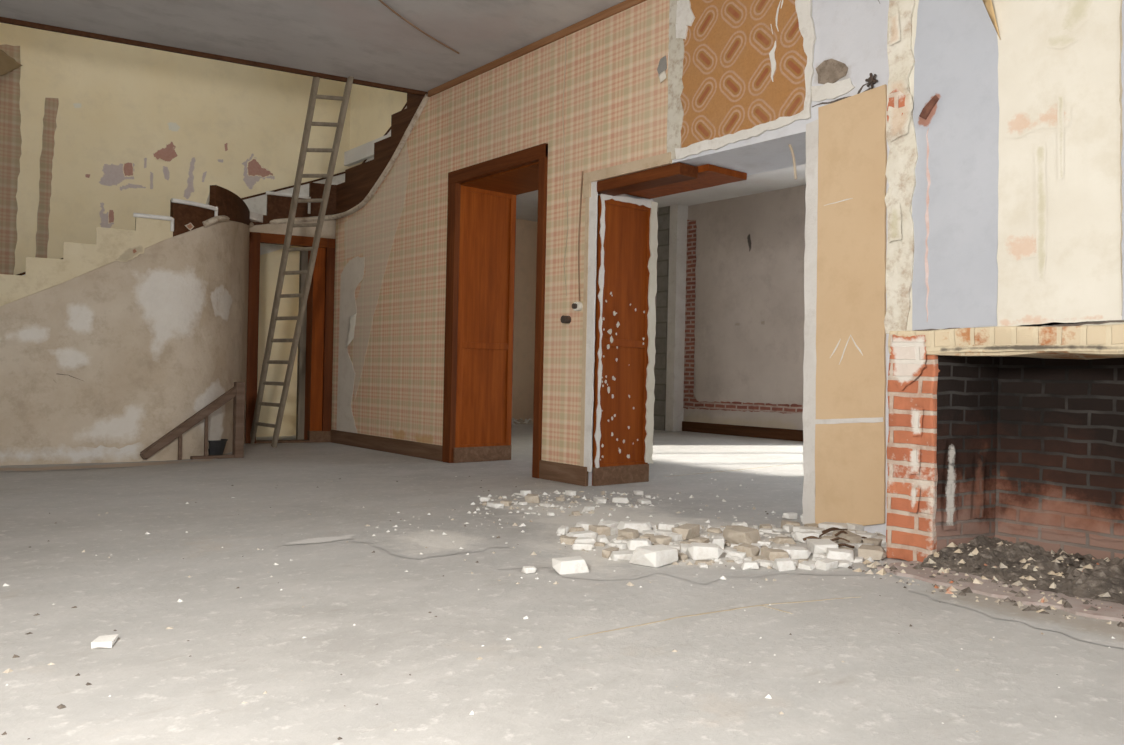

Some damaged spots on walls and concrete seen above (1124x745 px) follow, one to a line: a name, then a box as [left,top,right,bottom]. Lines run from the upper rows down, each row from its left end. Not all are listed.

peeling [99,201,114,228]
peeling [85,141,228,200]
peeling [241,153,277,190]
peeling [884,0,918,334]
corrosion [915,91,943,322]
peeling [0,298,102,374]
peeling [124,256,233,372]
peeling [336,256,365,433]